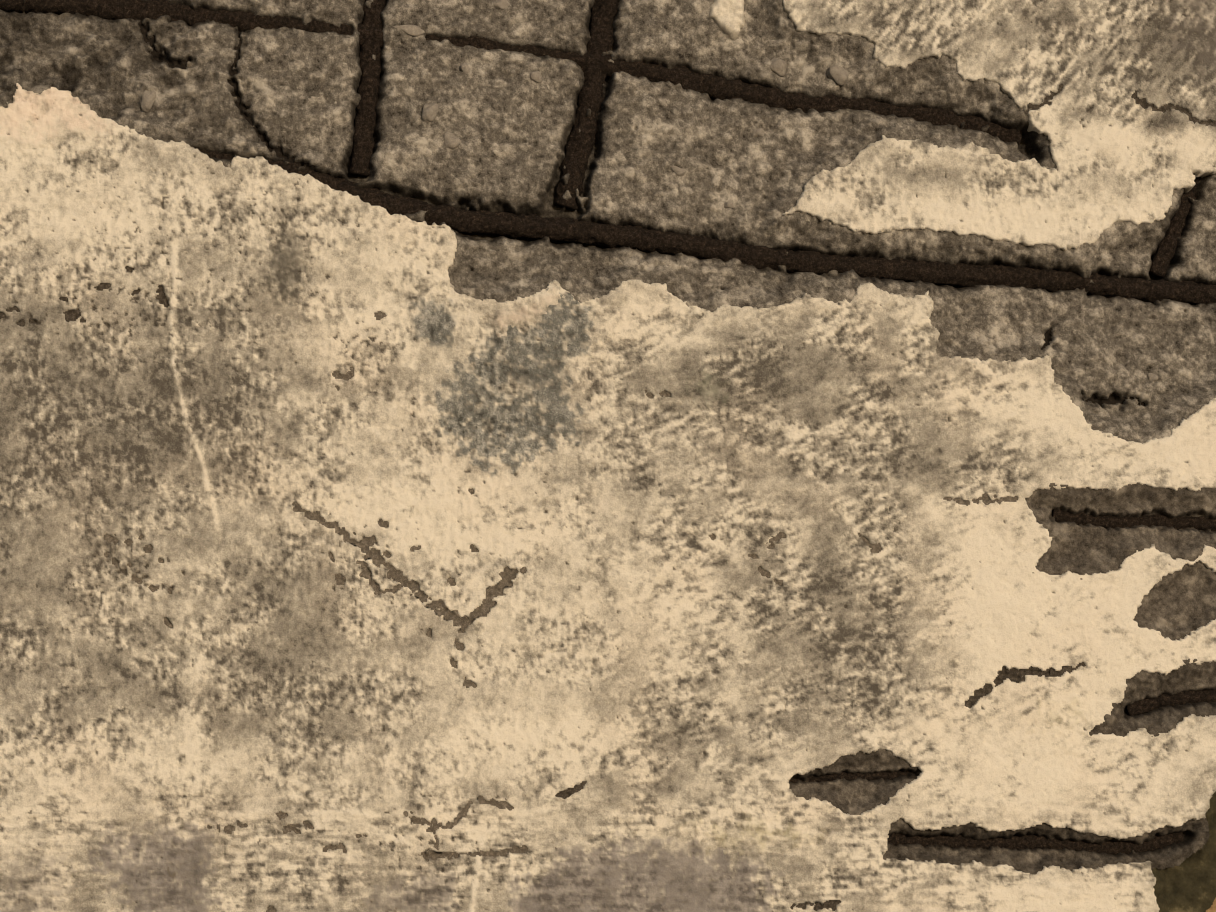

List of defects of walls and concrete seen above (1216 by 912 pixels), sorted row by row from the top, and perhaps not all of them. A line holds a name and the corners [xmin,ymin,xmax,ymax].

spalling [0,0,1216,444]
crack [292,502,527,633]
hole [748,532,786,586]
hole [858,533,882,553]
spalling [1025,482,1216,641]
crack [964,662,1086,708]
spalling [1089,659,1216,737]
spalling [788,749,922,815]
spalling [883,818,1211,875]